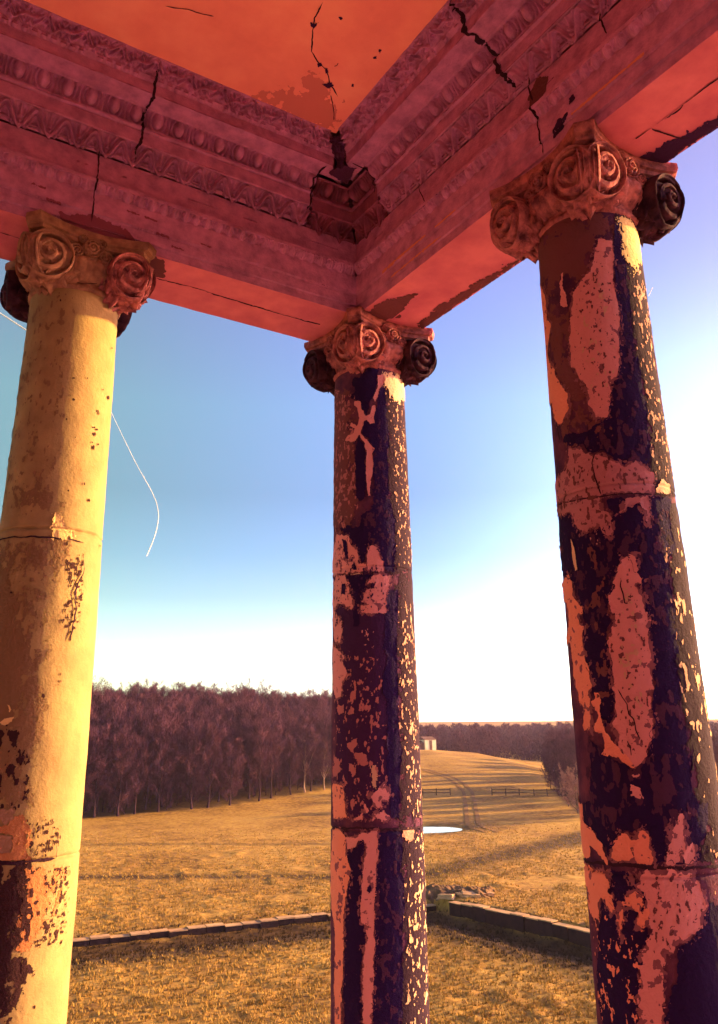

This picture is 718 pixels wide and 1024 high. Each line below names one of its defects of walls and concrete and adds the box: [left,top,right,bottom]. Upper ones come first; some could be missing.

crack [91,151,100,221]
crack [135,68,160,158]
crack [311,4,338,120]
crack [449,1,543,153]
crack [635,79,718,139]
peeling [559,215,642,418]
peeling [345,371,405,496]
crack [0,535,85,642]
peeling [332,534,390,715]
spalling [559,541,654,799]
peeling [330,739,390,1024]
spalling [578,796,708,1024]